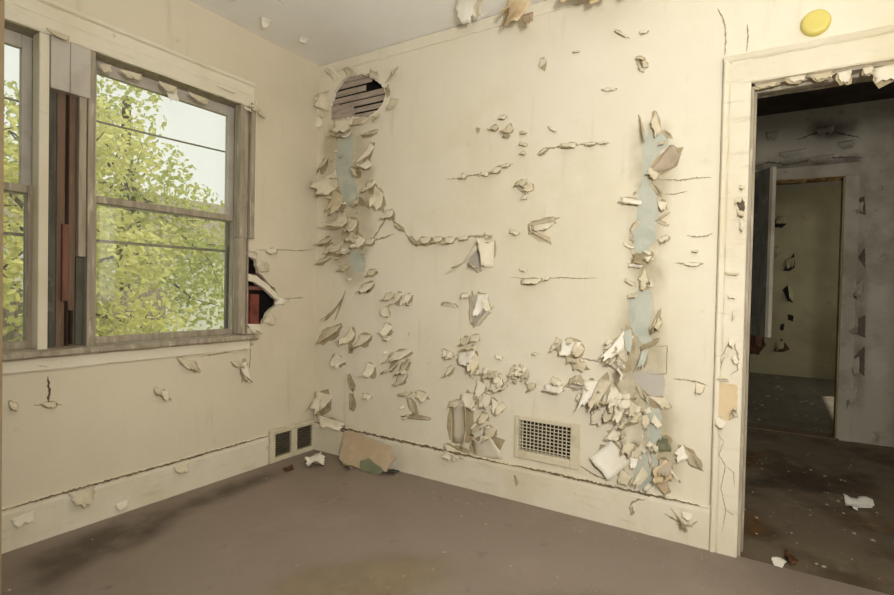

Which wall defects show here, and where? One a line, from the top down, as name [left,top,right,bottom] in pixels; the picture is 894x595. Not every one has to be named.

peeling [455,0,483,25]
peeling [500,0,534,28]
crack [718,9,749,54]
peeling [753,61,894,90]
peeling [308,66,431,421]
spalling [177,250,290,384]
peeling [441,110,703,516]
peeling [750,314,794,355]
peeling [849,315,866,376]
peeling [36,378,61,408]
crack [315,414,699,506]
crack [719,437,735,530]